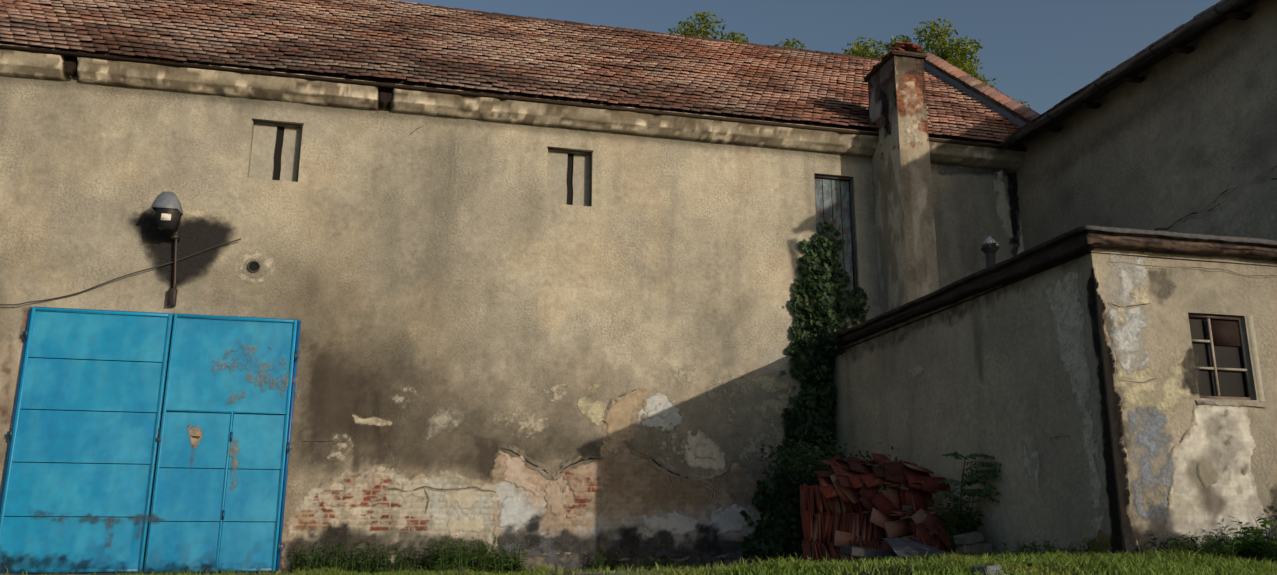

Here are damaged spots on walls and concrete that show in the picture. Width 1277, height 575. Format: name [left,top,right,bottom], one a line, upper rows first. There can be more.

spalling [898,76,922,143]
crack [1152,164,1277,232]
rust [188,425,203,447]
rust [229,440,239,490]
spalling [280,384,776,569]
peeling [749,374,792,420]
spalling [1044,253,1272,554]
leakage [276,515,754,574]